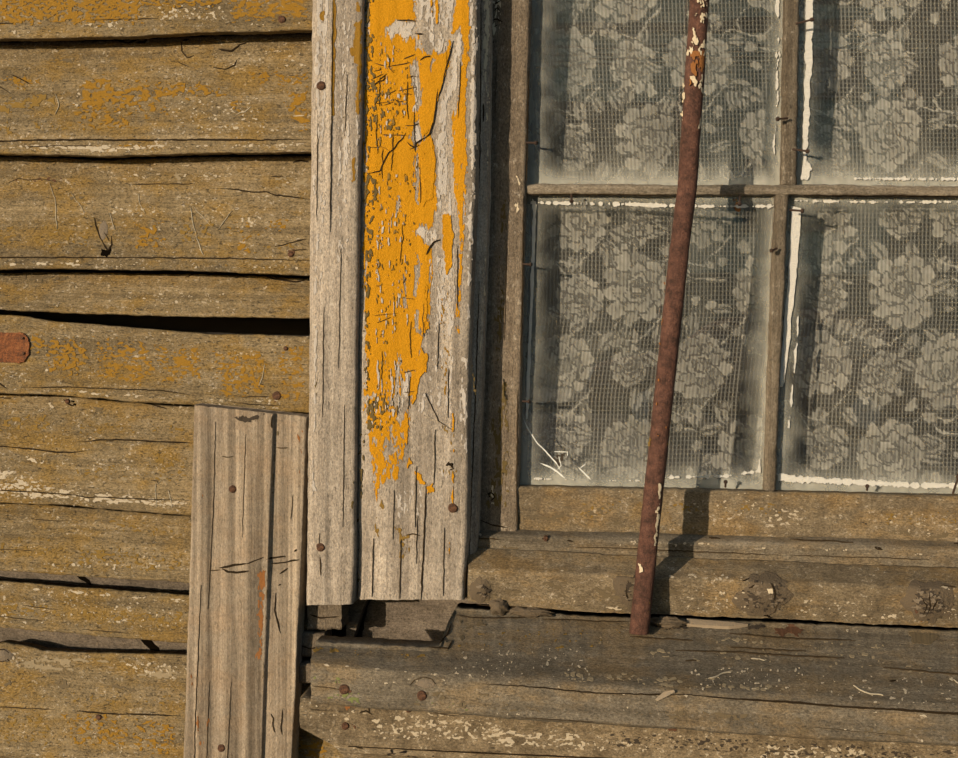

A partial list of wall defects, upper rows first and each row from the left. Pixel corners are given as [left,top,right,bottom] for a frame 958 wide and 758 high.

crack [0,8,347,225]
crack [0,218,310,283]
peeling [0,0,501,559]
crack [0,383,195,409]
crack [231,396,288,449]
crack [322,265,345,515]
crack [0,422,321,758]